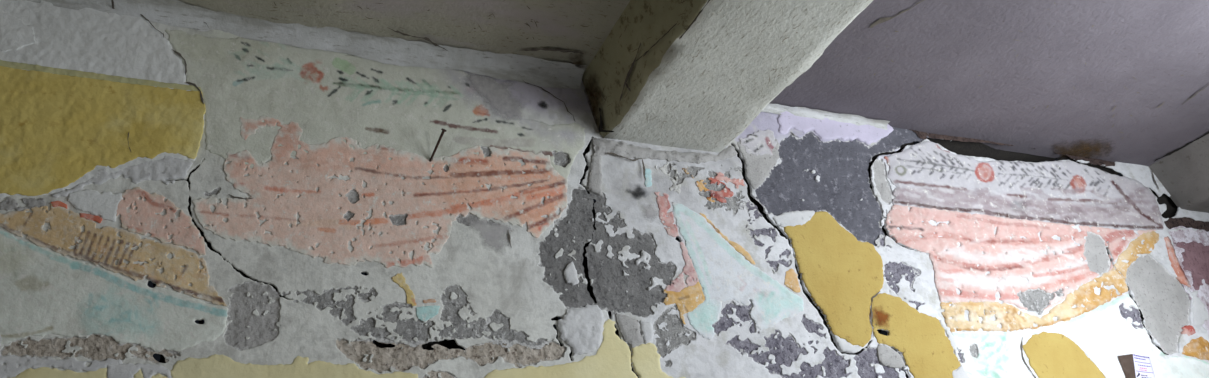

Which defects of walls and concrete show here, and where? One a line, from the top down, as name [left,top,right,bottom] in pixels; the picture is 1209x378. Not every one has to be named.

crack [520,47,584,55]
flaking render [0,334,181,378]
flaking render [67,189,123,222]
crack [167,166,298,303]
flaking render [224,187,696,378]
crack [524,81,646,378]
flaking render [712,299,910,378]
crack [732,144,908,378]
flaking render [666,111,1014,310]
flaking render [939,320,978,378]
flaking render [1083,231,1111,275]
flaking render [1119,217,1209,355]